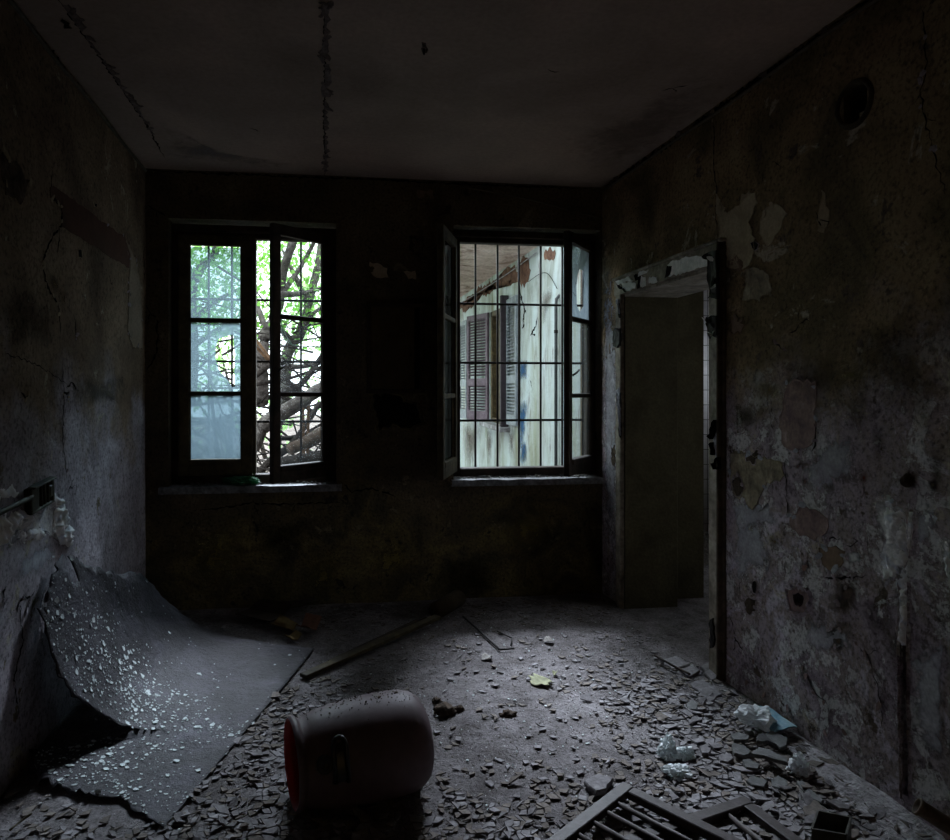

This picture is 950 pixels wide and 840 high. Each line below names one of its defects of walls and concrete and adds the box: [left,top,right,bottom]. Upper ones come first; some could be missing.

crack [58,0,869,239]
peeling [615,252,714,318]
peeling [715,191,787,302]
crack [6,353,79,492]
spalling [744,580,758,616]
peeling [785,501,857,655]